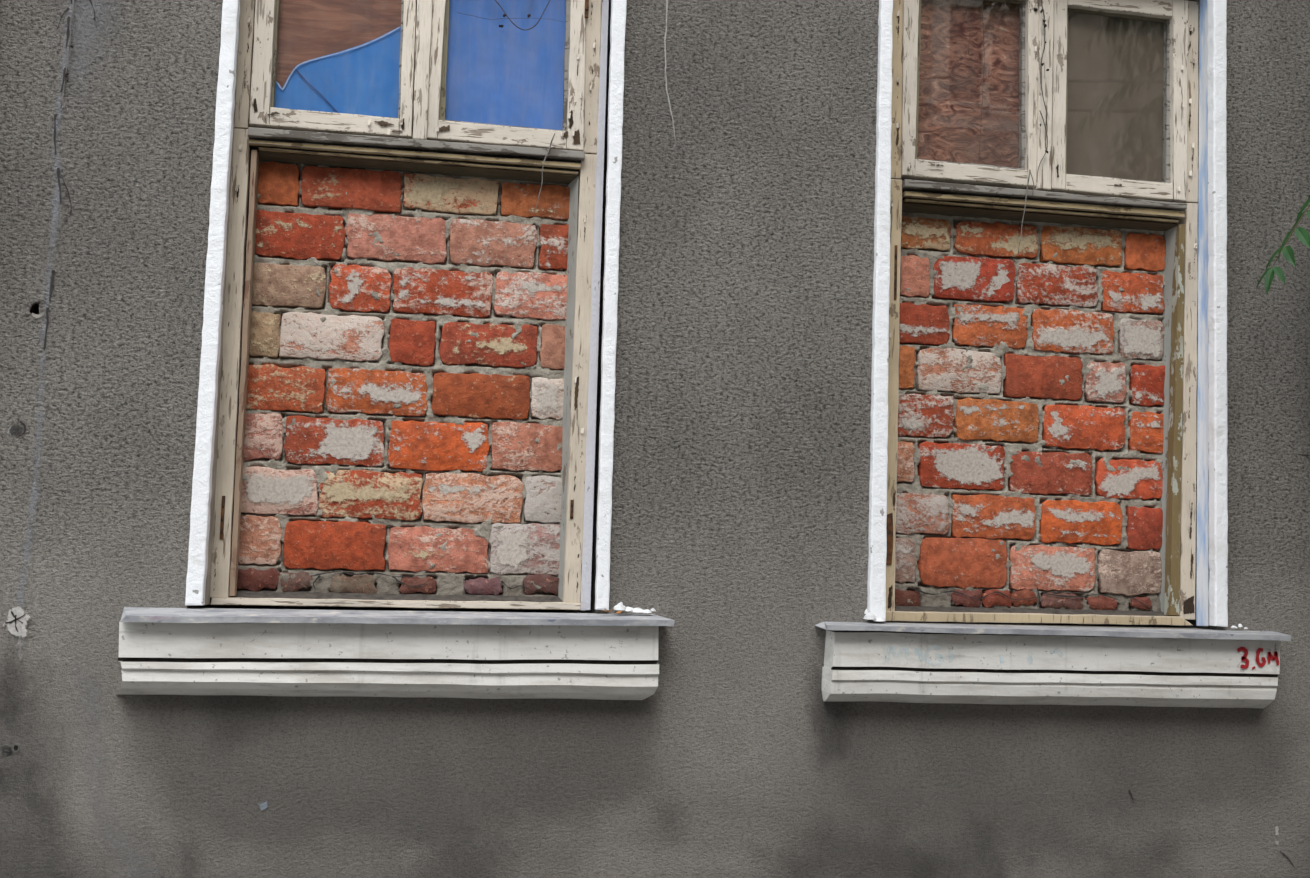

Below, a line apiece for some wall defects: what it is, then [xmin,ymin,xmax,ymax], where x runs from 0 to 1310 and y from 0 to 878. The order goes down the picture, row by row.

peeling [244,17,280,118]
peeling [368,118,405,135]
peeling [561,42,596,145]
peeling [1178,98,1194,192]
peeling [1183,596,1195,614]